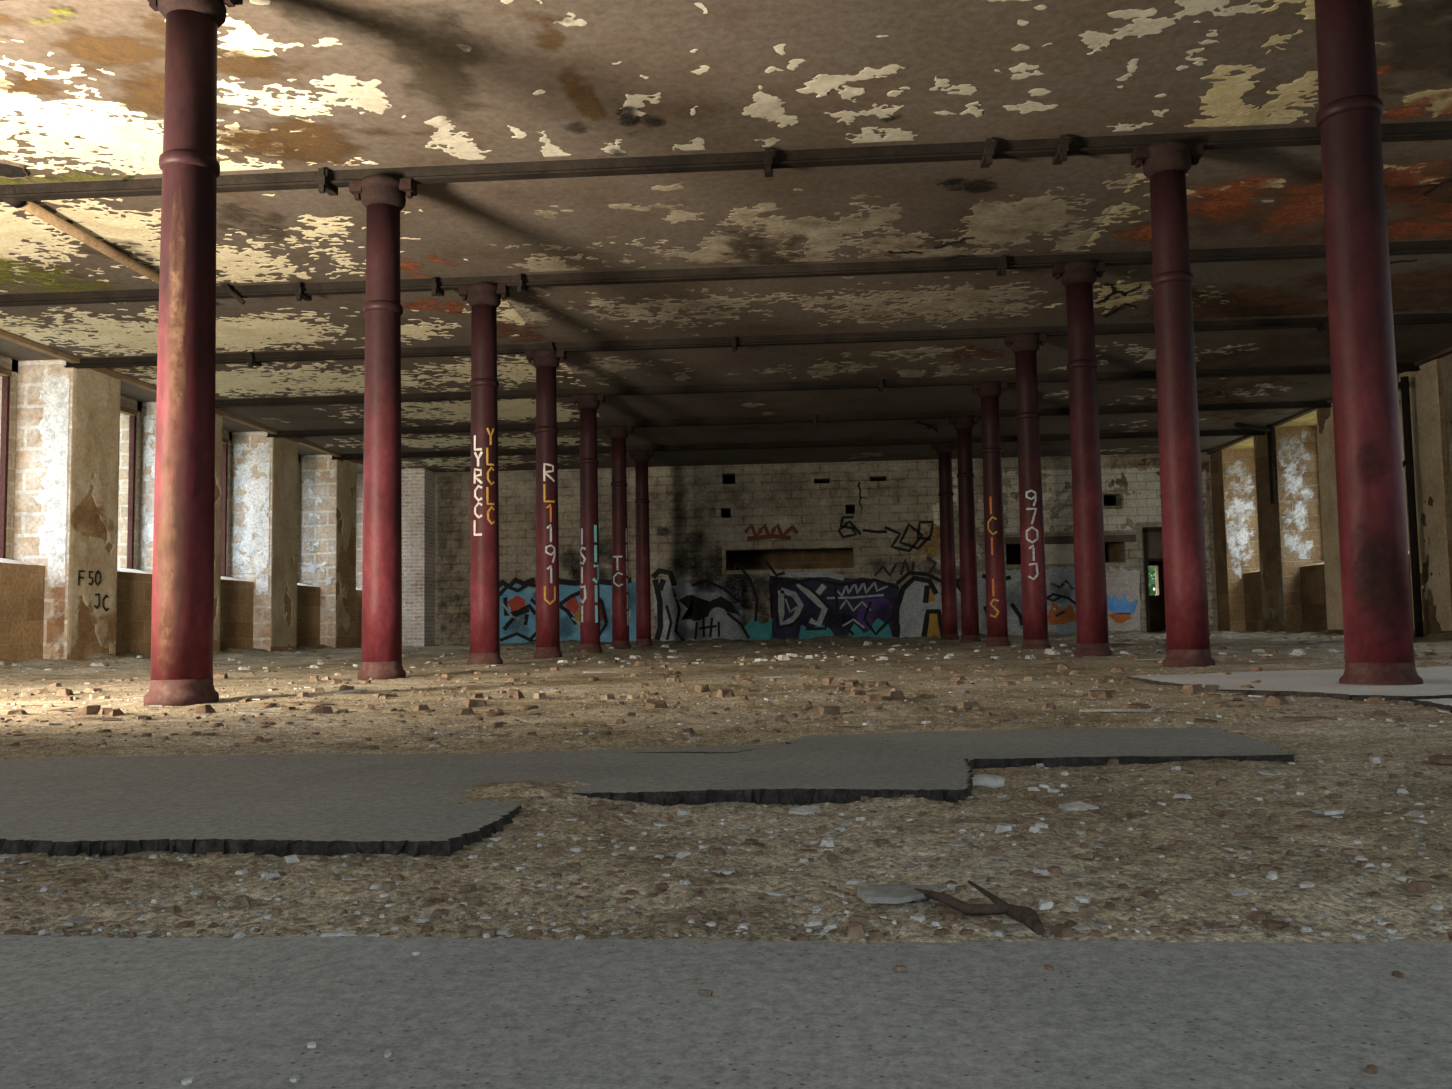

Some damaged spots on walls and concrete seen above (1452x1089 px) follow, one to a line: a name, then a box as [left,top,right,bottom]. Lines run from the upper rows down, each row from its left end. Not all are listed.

peeling [553,12,587,27]
peeling [0,40,164,179]
peeling [217,13,406,171]
peeling [424,116,492,160]
peeling [507,125,572,157]
peeling [620,75,662,118]
peeling [742,44,917,147]
peeling [929,77,984,118]
peeling [995,43,1058,114]
peeling [1078,0,1319,131]
peeling [0,198,161,292]
peeling [216,214,366,283]